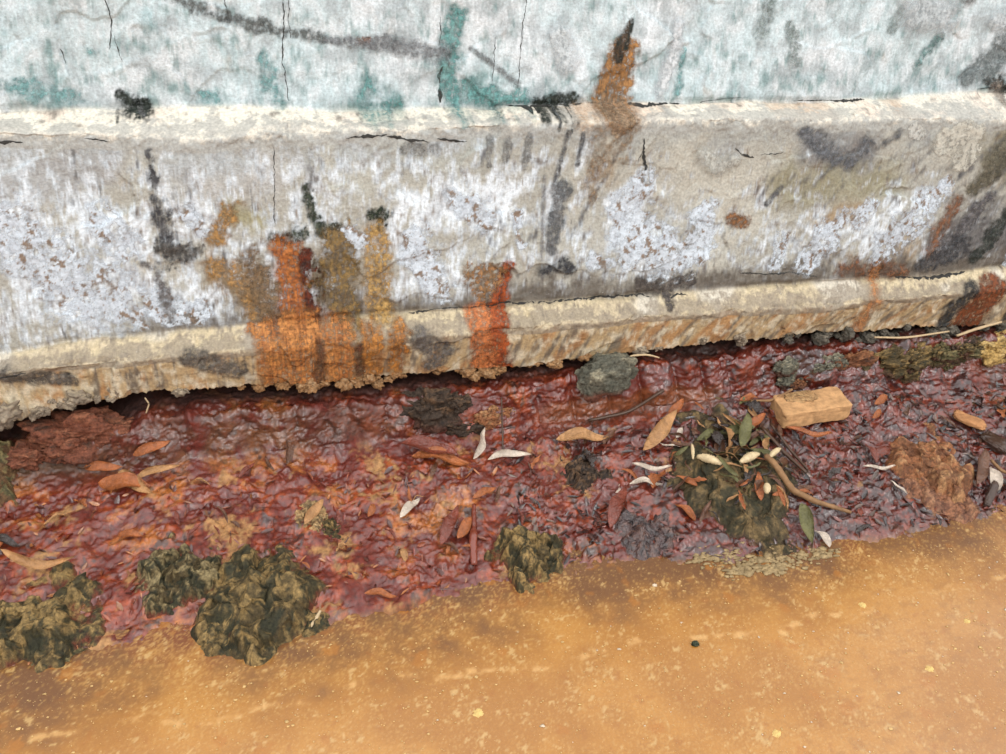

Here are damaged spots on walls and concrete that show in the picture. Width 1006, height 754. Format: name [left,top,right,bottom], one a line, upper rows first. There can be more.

crack [282,0,291,98]
leakage [175,0,585,275]
rust [584,19,640,202]
leakage [915,33,945,67]
leakage [958,35,1006,105]
leakage [140,149,204,322]
rust [203,201,411,385]
rust [464,261,515,368]
rust [937,273,1006,328]